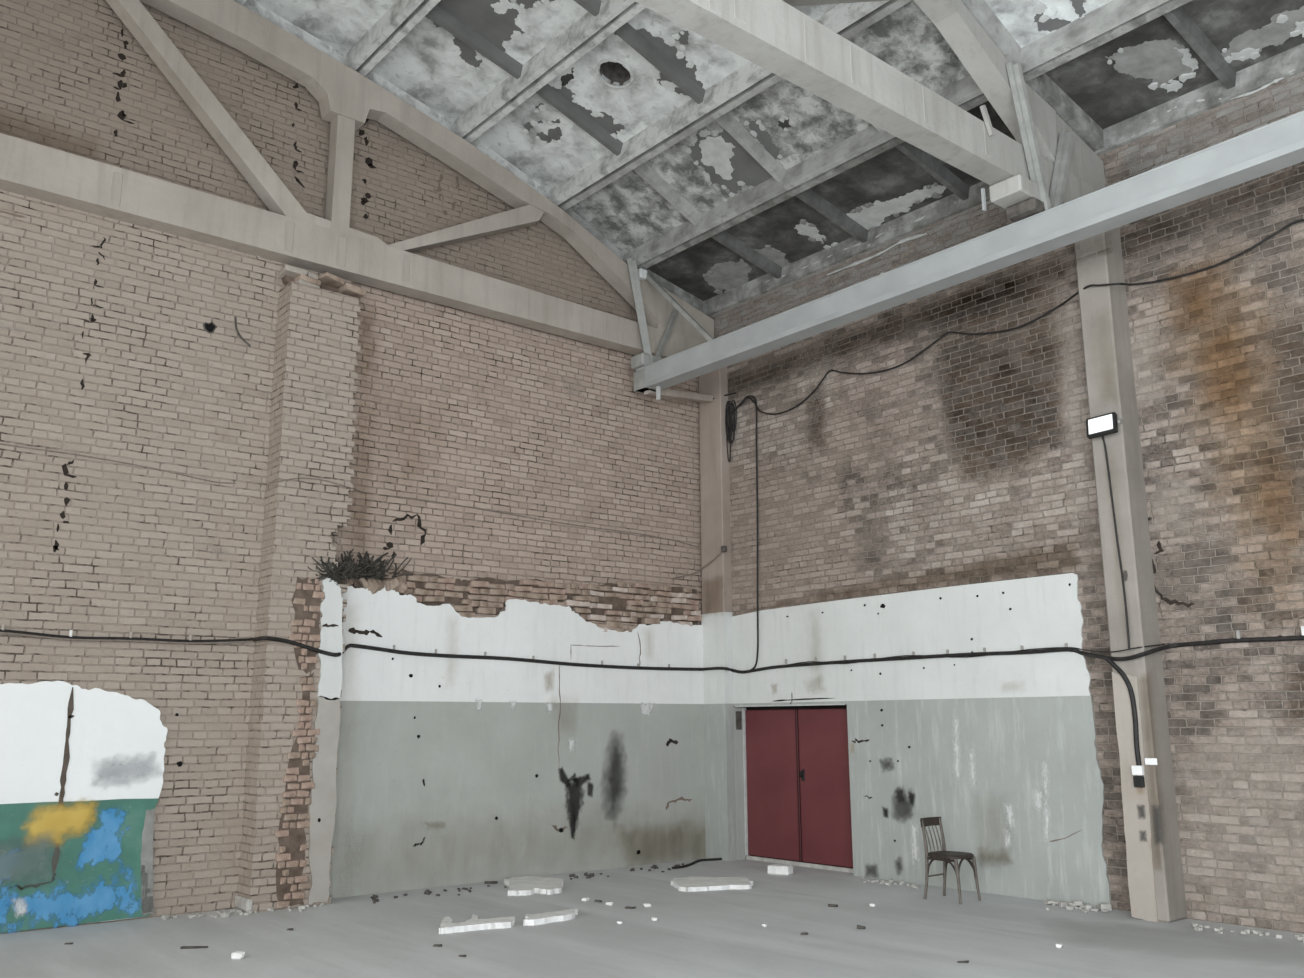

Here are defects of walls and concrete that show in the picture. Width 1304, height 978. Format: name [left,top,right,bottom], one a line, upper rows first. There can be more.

crack [112,28,149,137]
peeling [422,0,555,71]
peeling [636,28,703,96]
crack [359,119,376,219]
peeling [685,117,791,197]
peeling [702,182,956,294]
crack [80,237,106,390]
crack [53,460,77,552]
crack [383,514,426,559]
spalling [353,566,702,632]
crack [55,687,74,806]
spalling [275,576,325,909]